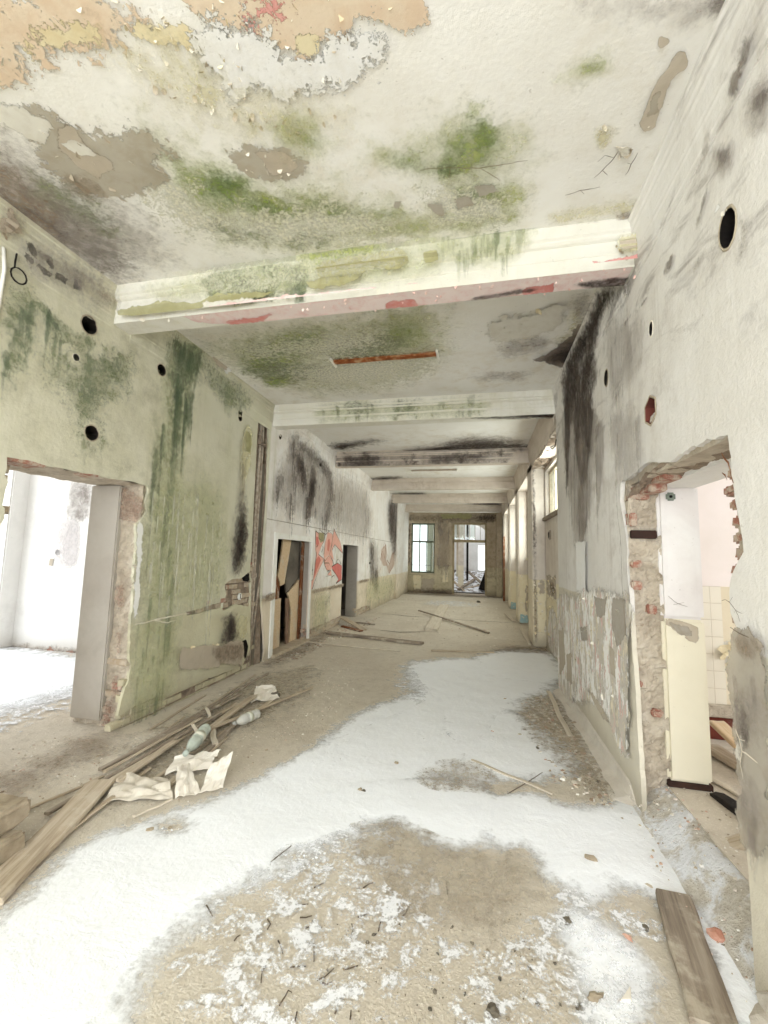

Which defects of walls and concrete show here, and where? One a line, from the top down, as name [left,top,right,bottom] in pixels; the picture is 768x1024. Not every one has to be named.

peeling [0,0,431,202]
peeling [639,36,688,132]
water stain [139,123,523,301]
water stain [4,291,131,448]
water stain [232,428,252,573]
water stain [276,435,380,532]
water stain [430,449,523,464]
water stain [565,323,597,488]
flaking render [5,457,254,732]
flaking render [186,562,275,615]
flaking render [510,450,744,796]